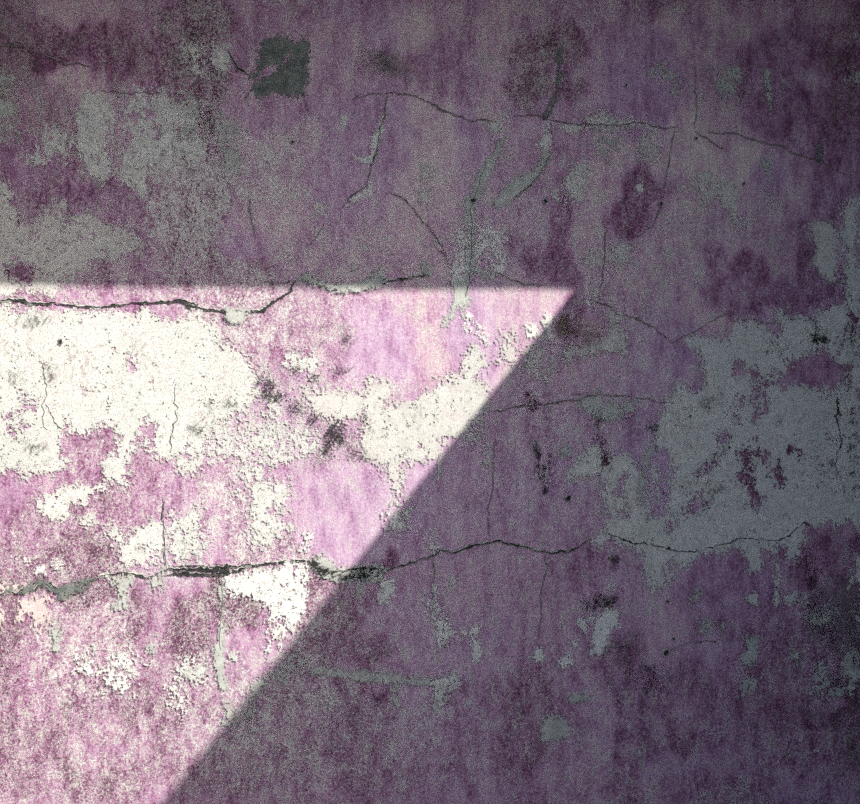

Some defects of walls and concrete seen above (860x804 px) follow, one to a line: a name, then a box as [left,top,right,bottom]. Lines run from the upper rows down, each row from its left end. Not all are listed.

crack [228,51,254,107]
spalling [178,32,315,102]
crack [0,92,555,328]
crack [514,44,847,237]
crack [591,221,816,343]
peeling [0,63,639,739]
crack [494,393,671,412]
peeling [556,192,860,707]
crack [0,437,815,692]